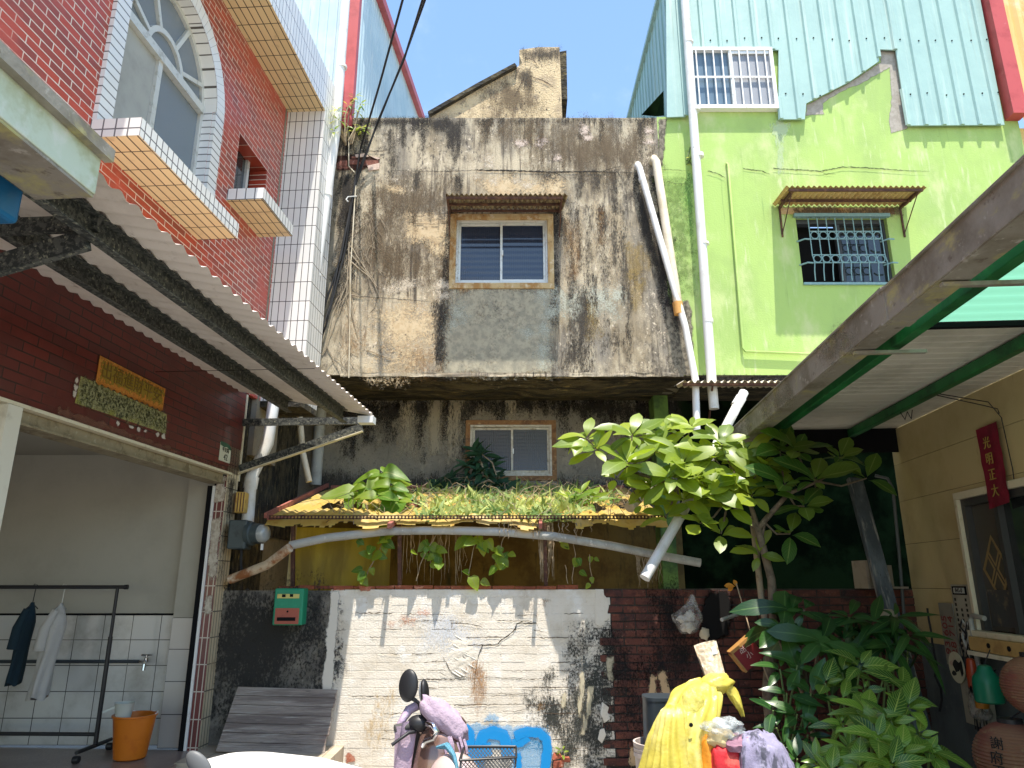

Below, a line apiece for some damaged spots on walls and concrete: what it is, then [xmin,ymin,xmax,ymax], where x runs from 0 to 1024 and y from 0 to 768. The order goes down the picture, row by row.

peeling [806,50,908,133]
leakage [329,48,696,373]
leakage [314,400,650,493]
leakage [668,400,684,417]
mould [210,570,348,734]
crack [336,612,586,740]
leakage [523,577,721,768]